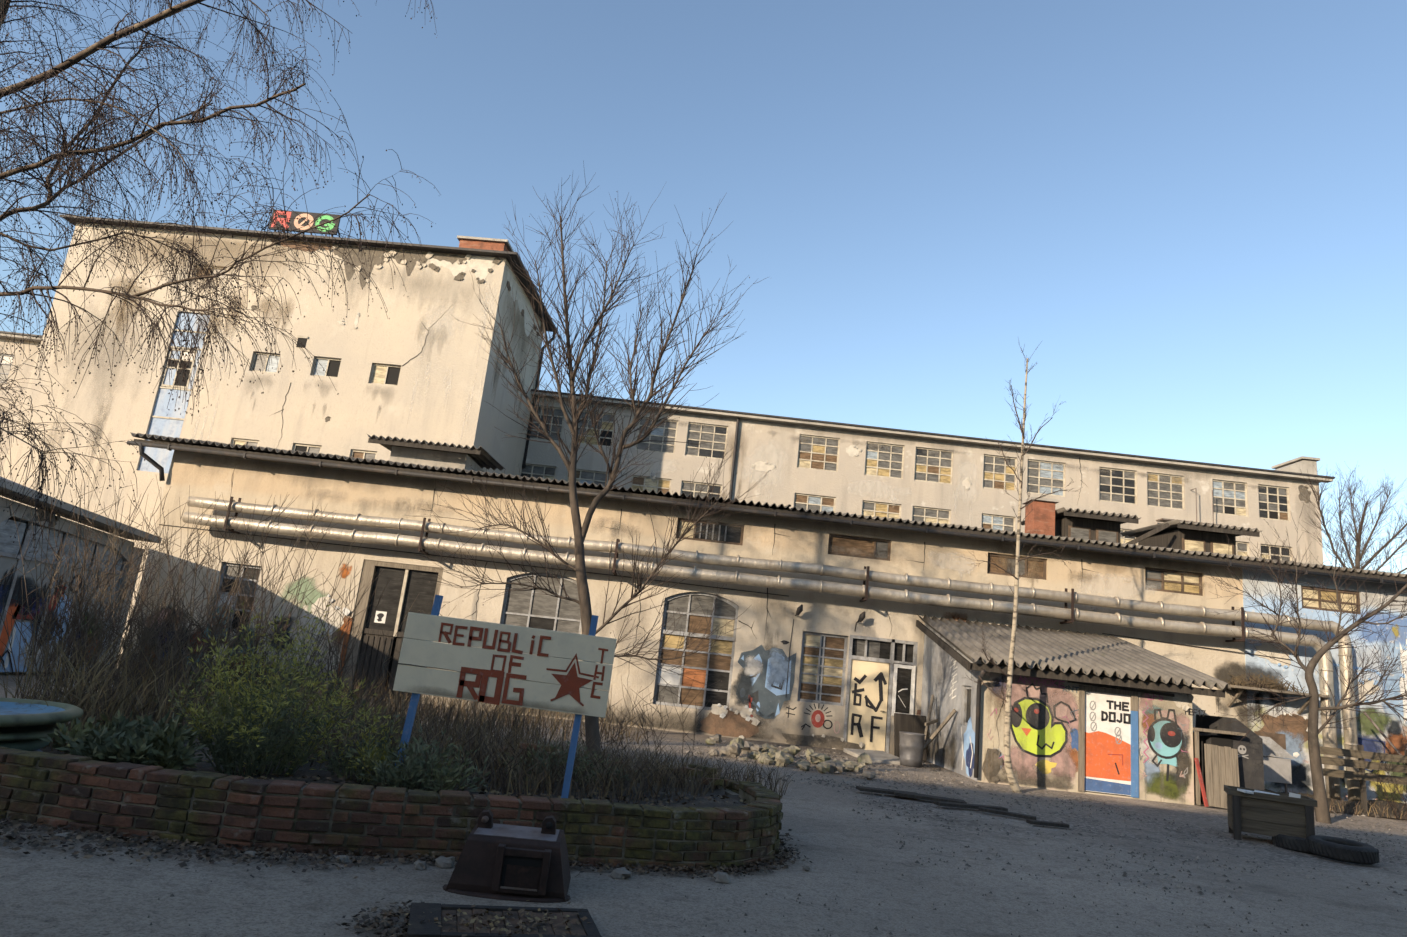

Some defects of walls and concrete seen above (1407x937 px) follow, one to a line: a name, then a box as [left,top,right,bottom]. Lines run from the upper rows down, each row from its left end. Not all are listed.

spalling [270,239,544,337]